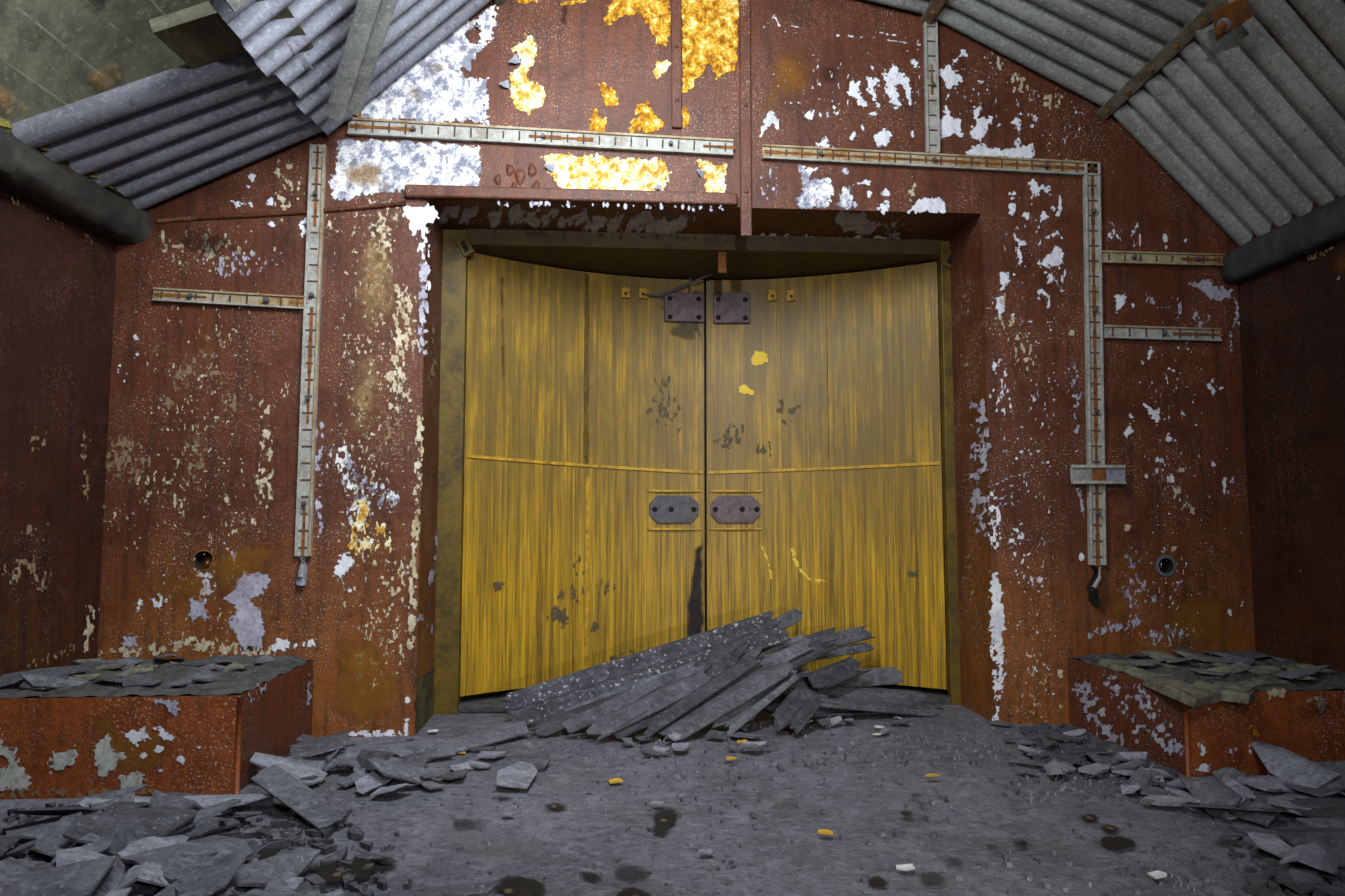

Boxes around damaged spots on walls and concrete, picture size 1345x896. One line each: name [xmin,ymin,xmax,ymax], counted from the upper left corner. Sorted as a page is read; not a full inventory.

peeling [360,2,546,125]
peeling [604,0,739,133]
peeling [759,50,920,147]
peeling [939,49,1084,160]
rust [346,166,380,185]
peeling [796,165,946,239]
rust [359,243,386,314]
peeling [315,138,727,688]
peeling [27,304,316,667]
spalling [961,179,1290,806]
rust [343,649,390,718]
rust [99,719,163,770]